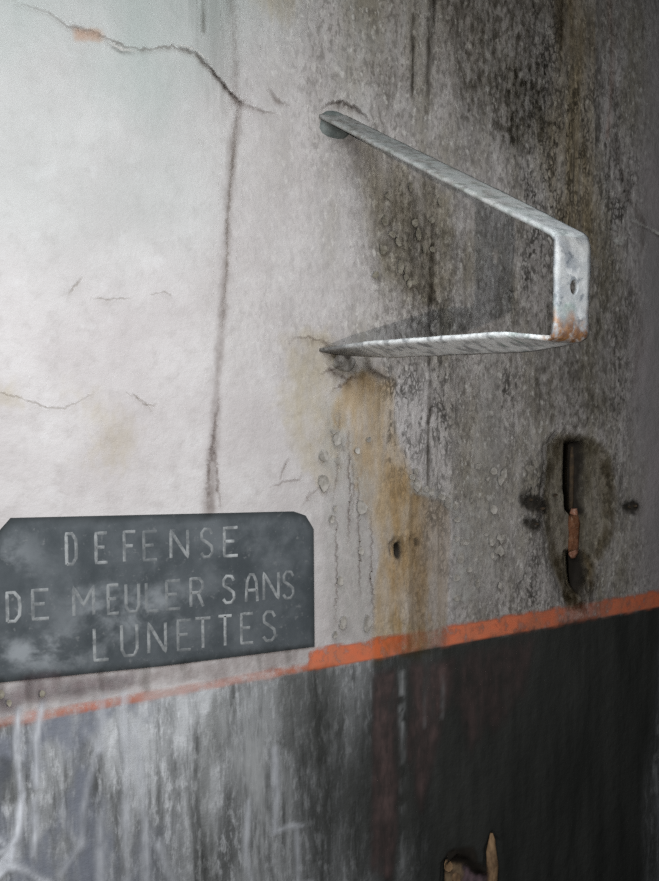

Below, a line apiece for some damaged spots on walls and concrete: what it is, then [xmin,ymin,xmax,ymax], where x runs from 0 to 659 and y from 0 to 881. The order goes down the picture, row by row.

crack [179,44,233,95]
spalling [444,833,499,881]